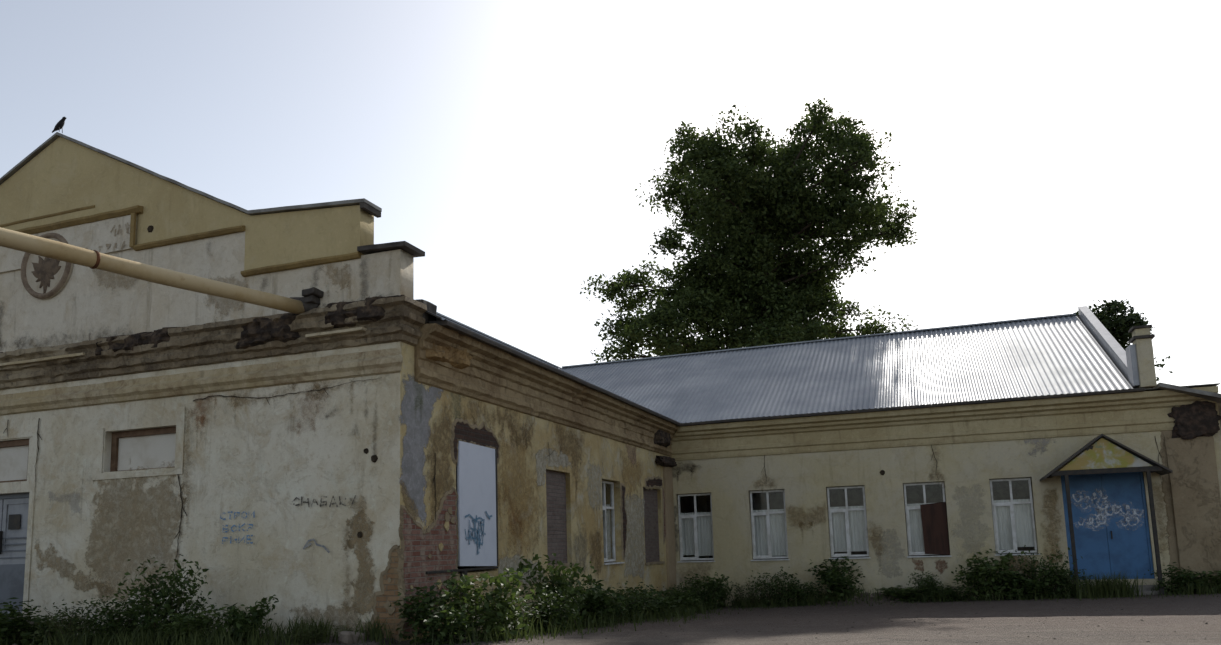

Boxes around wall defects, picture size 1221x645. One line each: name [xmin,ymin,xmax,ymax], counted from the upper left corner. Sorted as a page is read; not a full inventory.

spalling [450,417,500,465]
spalling [290,375,459,642]
spalling [34,543,113,593]
spalling [912,558,948,574]